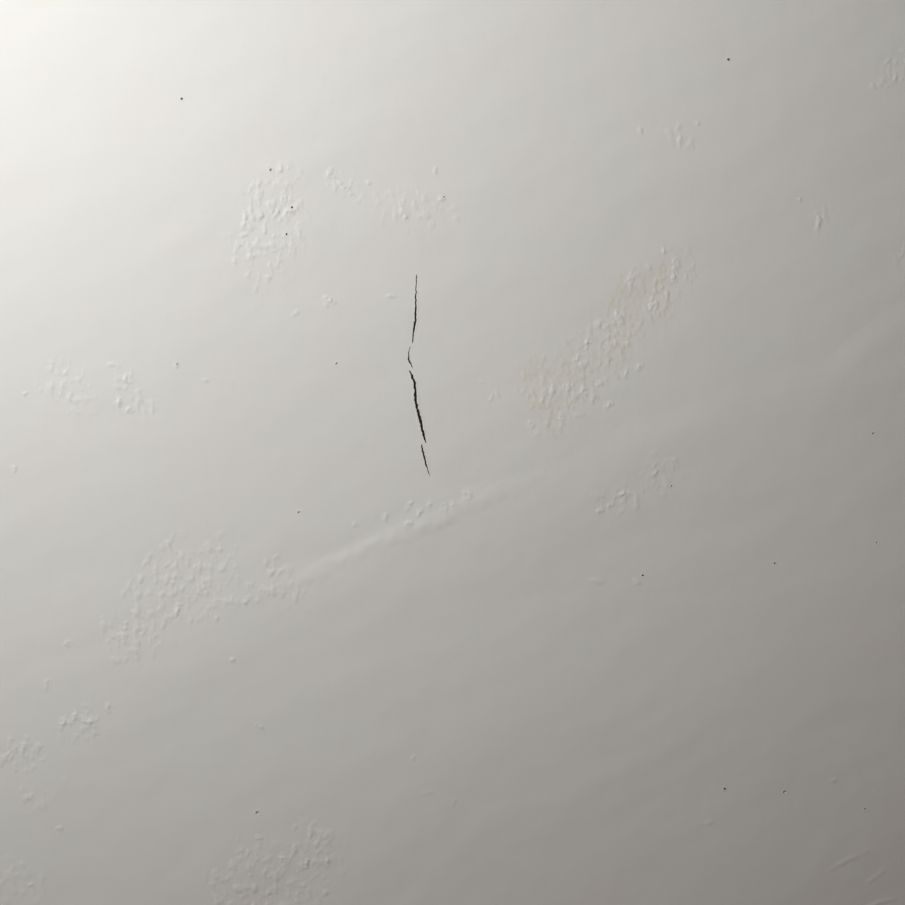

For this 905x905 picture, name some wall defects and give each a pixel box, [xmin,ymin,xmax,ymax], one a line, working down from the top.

crack [408,274,431,476]